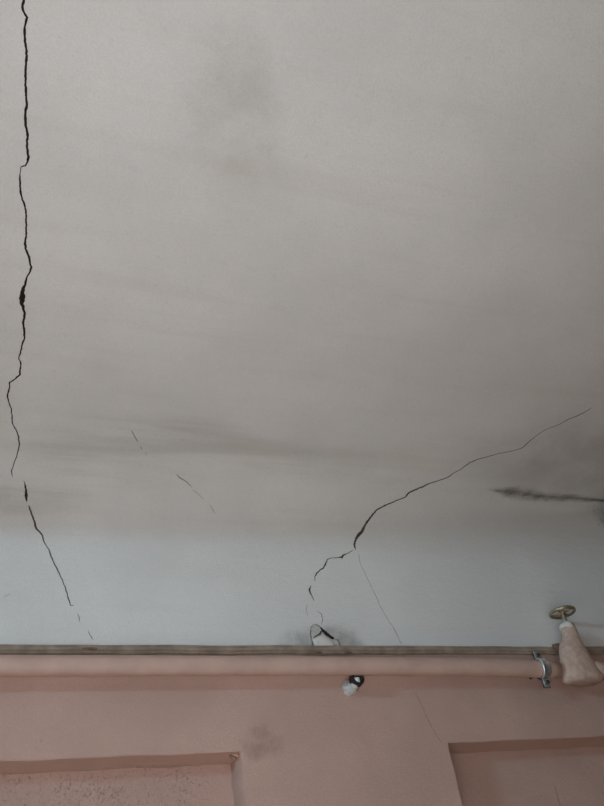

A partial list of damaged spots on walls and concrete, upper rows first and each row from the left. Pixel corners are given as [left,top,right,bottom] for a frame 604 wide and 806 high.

crack [7,0,93,639]
crack [306,408,591,656]